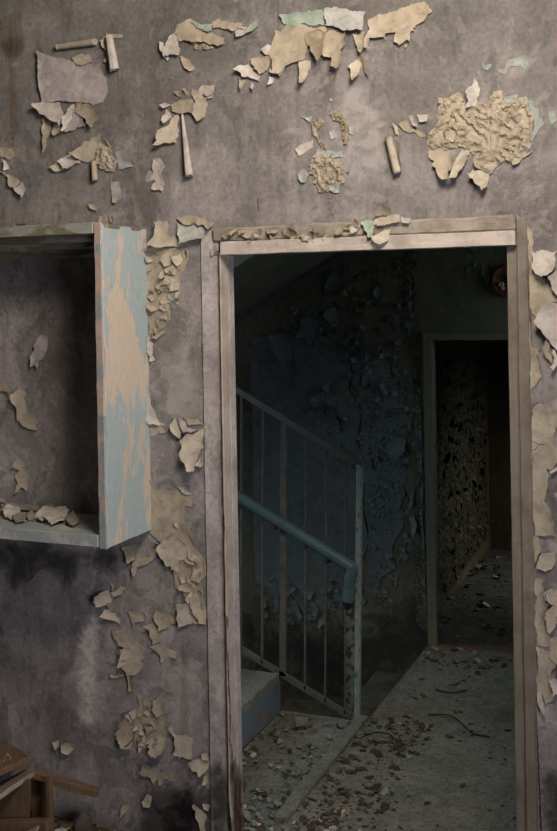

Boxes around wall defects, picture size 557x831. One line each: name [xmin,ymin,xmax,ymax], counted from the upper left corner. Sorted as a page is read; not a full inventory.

peeling [31,33,123,152]
peeling [50,134,133,203]
peeling [159,18,259,71]
peeling [222,204,411,244]
peeling [295,98,354,193]
peeling [233,2,433,90]
peeling [144,216,214,362]
peeling [146,388,204,472]
peeling [250,251,428,631]
peeling [435,347,491,603]
peeling [495,211,557,714]
peeling [93,480,210,786]